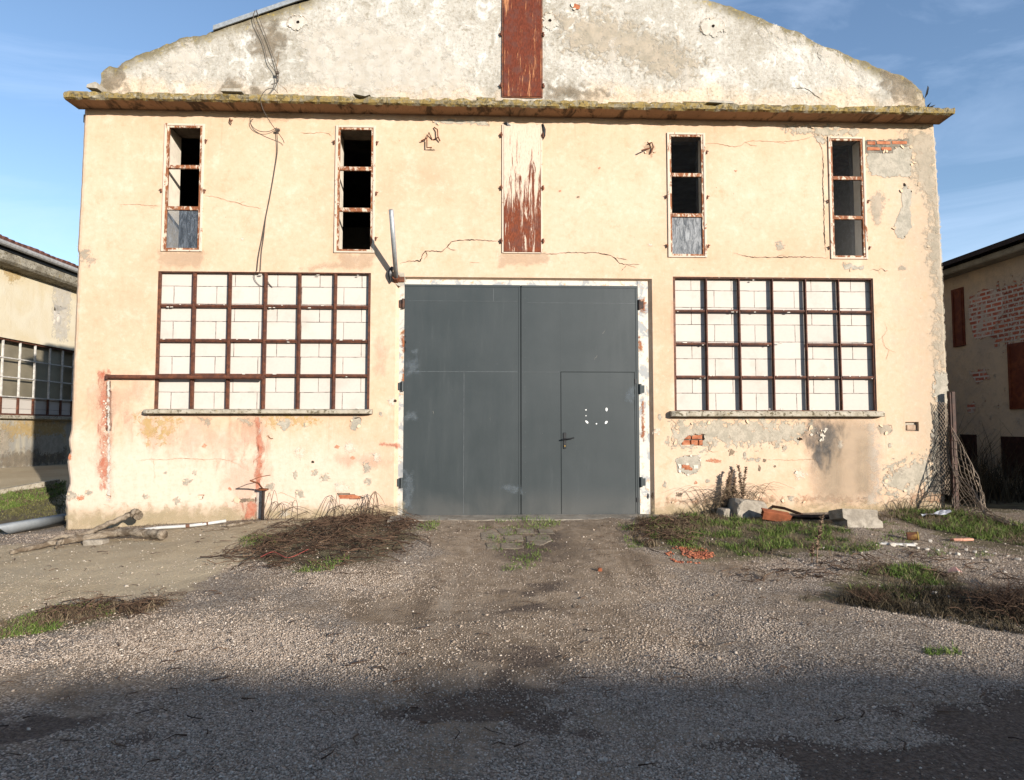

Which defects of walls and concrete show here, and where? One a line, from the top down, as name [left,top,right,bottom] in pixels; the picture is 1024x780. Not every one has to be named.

crack [400,239,492,264]
crack [558,252,640,270]
peeling [781,123,949,507]
rust [98,370,109,488]
rust [242,418,264,520]
peeling [651,482,705,505]
peeling [654,414,828,484]
water stain [815,424,871,497]